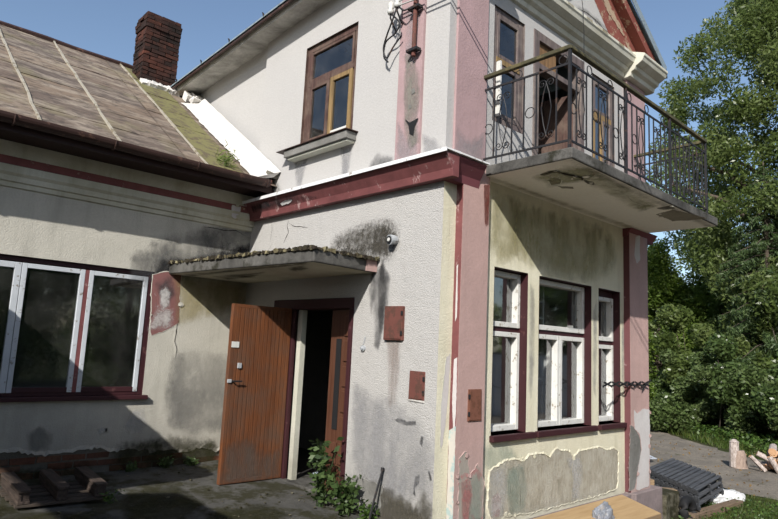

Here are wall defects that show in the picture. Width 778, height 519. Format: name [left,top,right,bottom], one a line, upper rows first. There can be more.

peeling [540,170,595,189]
damp [372,228,390,280]
damp [494,209,594,275]
peeling [149,245,380,336]
flaking render [0,438,220,480]
flaking render [440,354,619,519]
peeling [629,408,651,491]